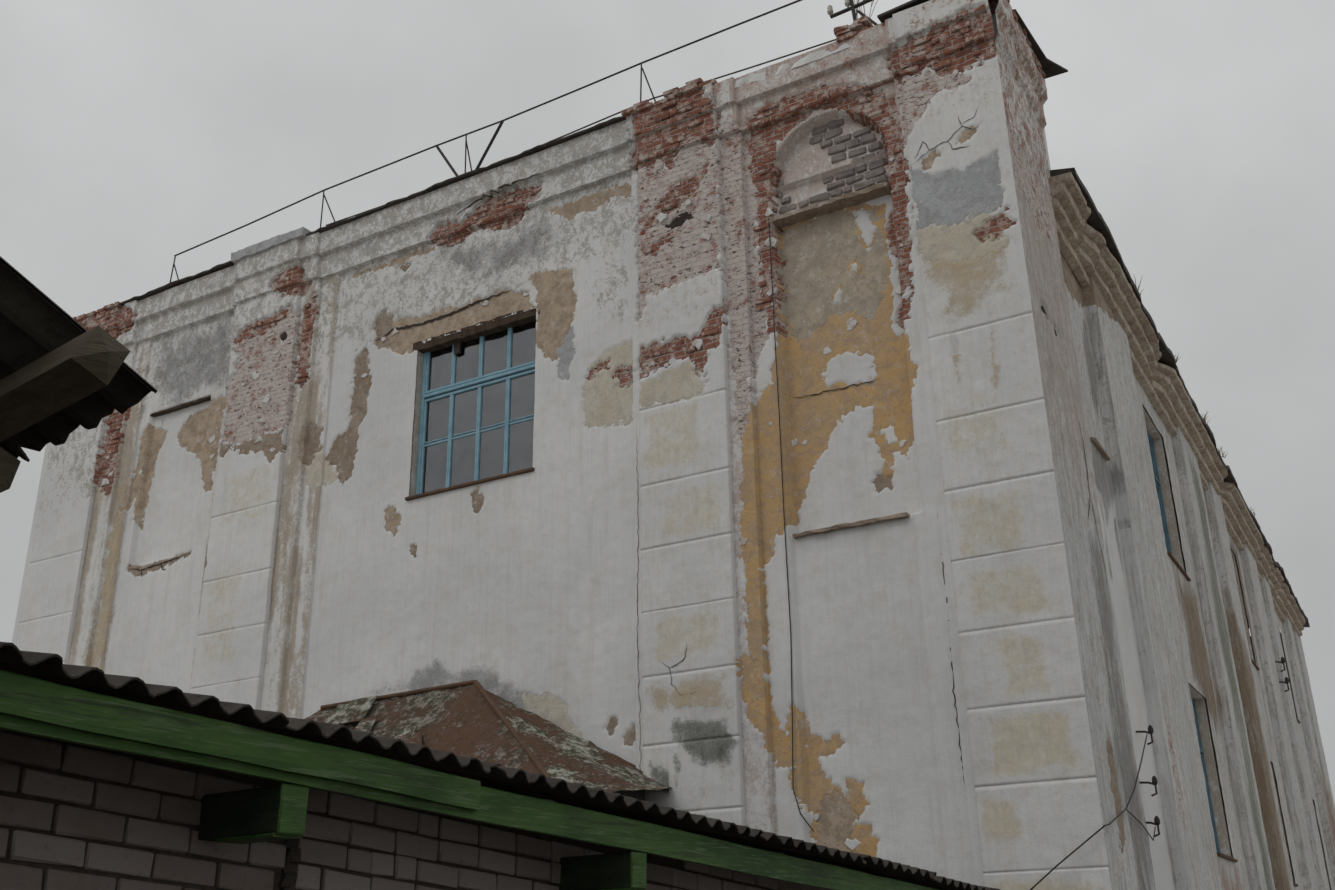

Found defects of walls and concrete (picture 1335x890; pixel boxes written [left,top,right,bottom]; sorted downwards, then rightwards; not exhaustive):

crack [916,110,981,162]
spalling [77,306,137,339]
flaking render [92,3,1016,530]
spalling [1005,119,1117,323]
flaking render [127,550,207,577]
peeling [739,510,773,703]
leakage [650,681,736,793]
flaking render [815,789,861,853]